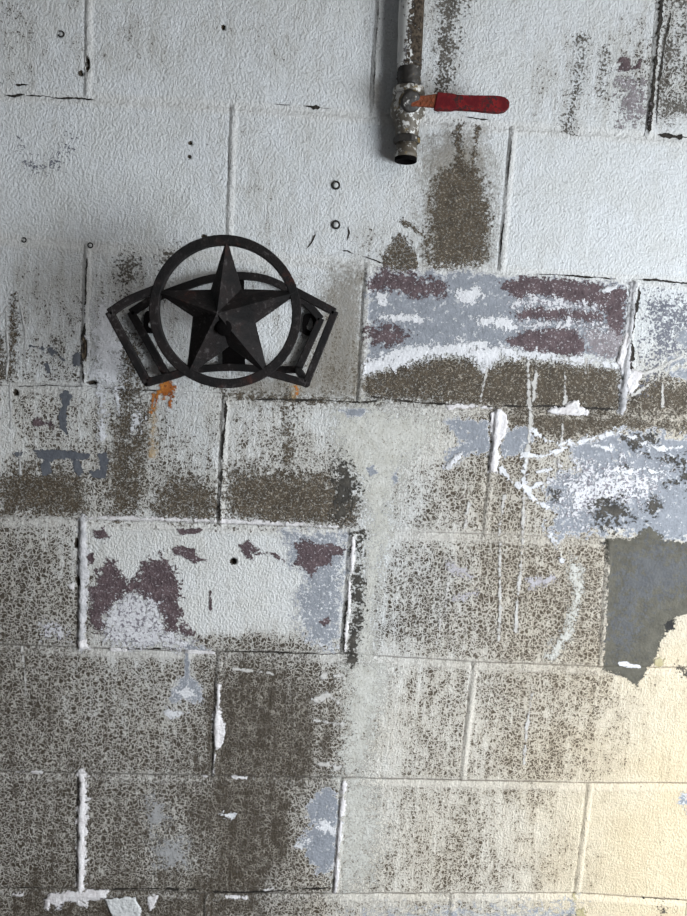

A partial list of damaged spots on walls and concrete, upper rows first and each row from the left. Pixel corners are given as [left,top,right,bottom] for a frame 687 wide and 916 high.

damp [425,0,477,93]
damp [557,31,613,136]
damp [651,0,687,128]
damp [381,119,495,273]
peeling [359,264,687,398]
corrosion [149,381,177,458]
peeling [93,525,112,544]
peeling [67,528,212,720]
peeling [230,527,352,654]
damp [0,244,687,902]
peeling [440,403,687,686]
peeling [105,893,158,916]